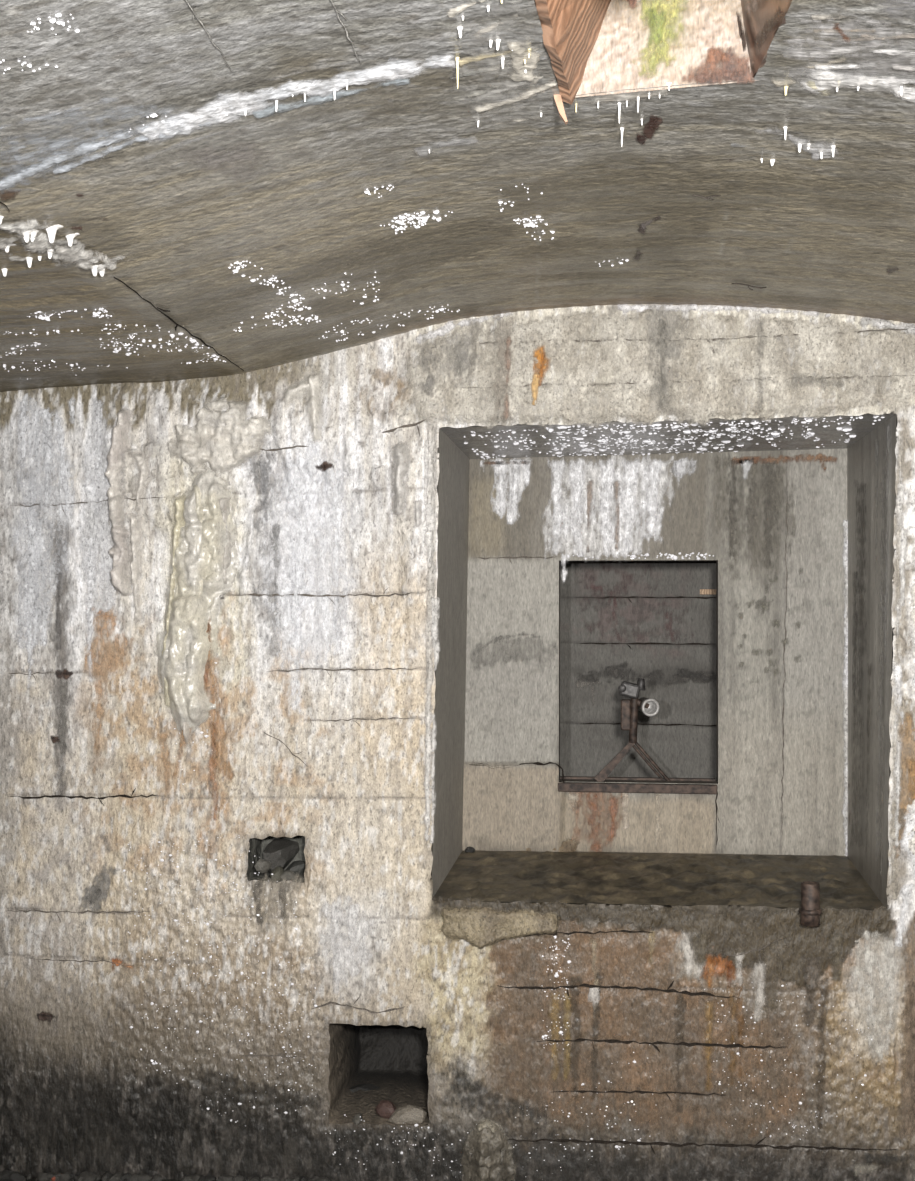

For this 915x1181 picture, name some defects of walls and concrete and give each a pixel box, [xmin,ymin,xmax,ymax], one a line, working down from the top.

crack [114,277,244,371]
rust [532,347,548,405]
leakage [406,306,915,427]
leakage [481,458,530,524]
leakage [543,455,696,581]
leakage [716,458,795,568]
leakage [844,425,915,871]
crack [497,981,740,999]
crack [537,1038,781,1054]
leakage [433,800,915,1181]
rust [703,954,745,1051]
crack [555,1090,720,1101]